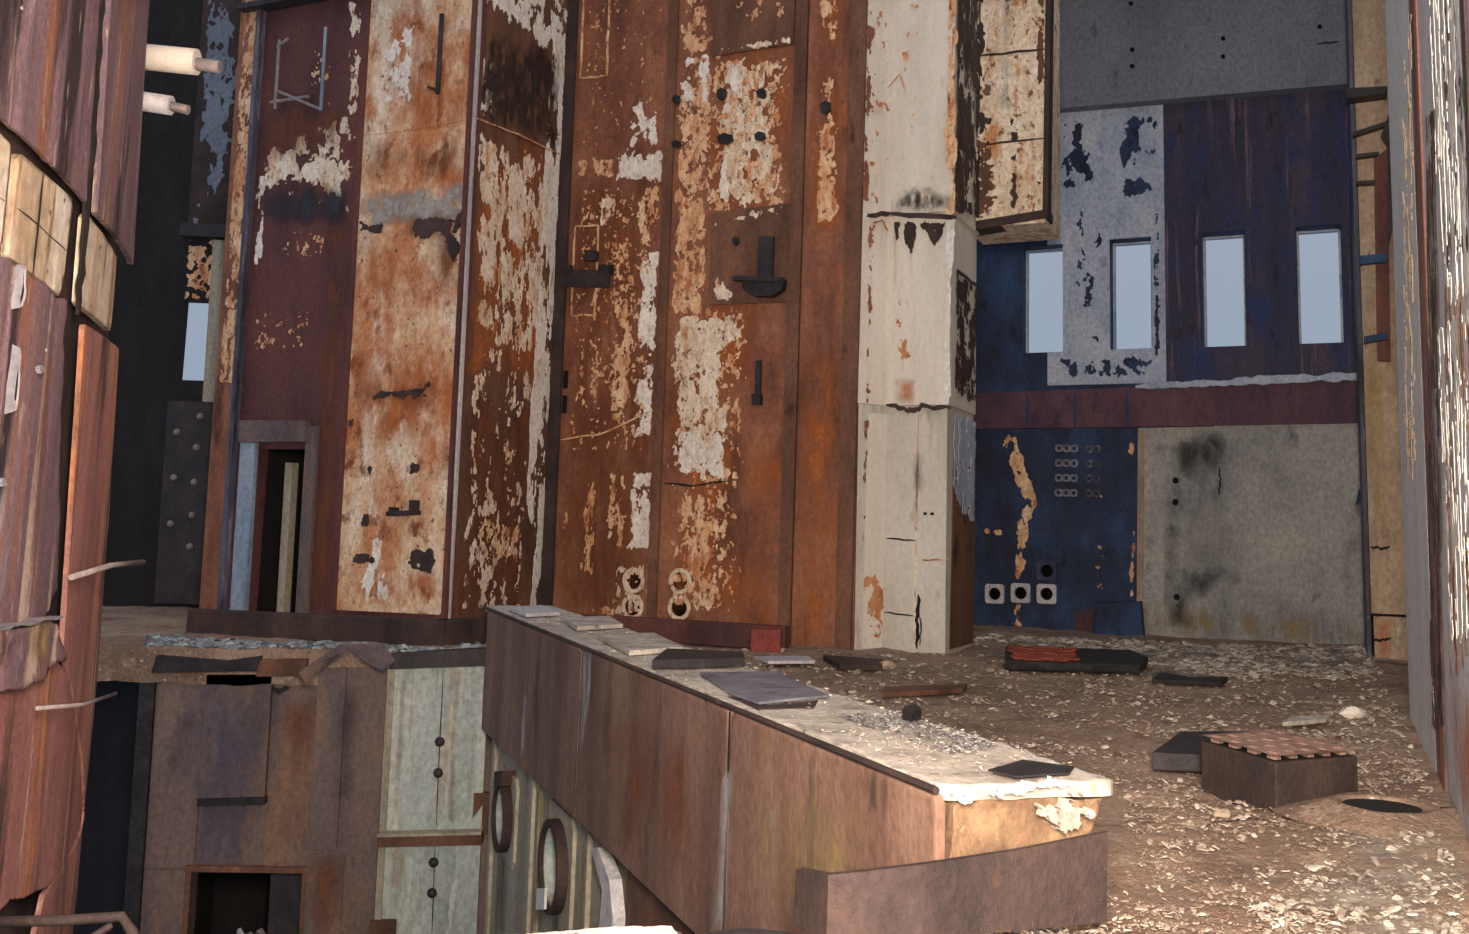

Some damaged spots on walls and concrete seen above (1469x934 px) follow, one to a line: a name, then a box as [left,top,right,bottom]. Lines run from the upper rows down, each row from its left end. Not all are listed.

peeling [193,0,461,383]
peeling [462,0,568,609]
rust [569,197,654,603]
peeling [562,0,791,615]
rust [699,307,743,385]
peeling [360,533,388,601]
rust [685,468,736,599]
peeling [953,414,1037,579]
spalling [950,776,1095,834]